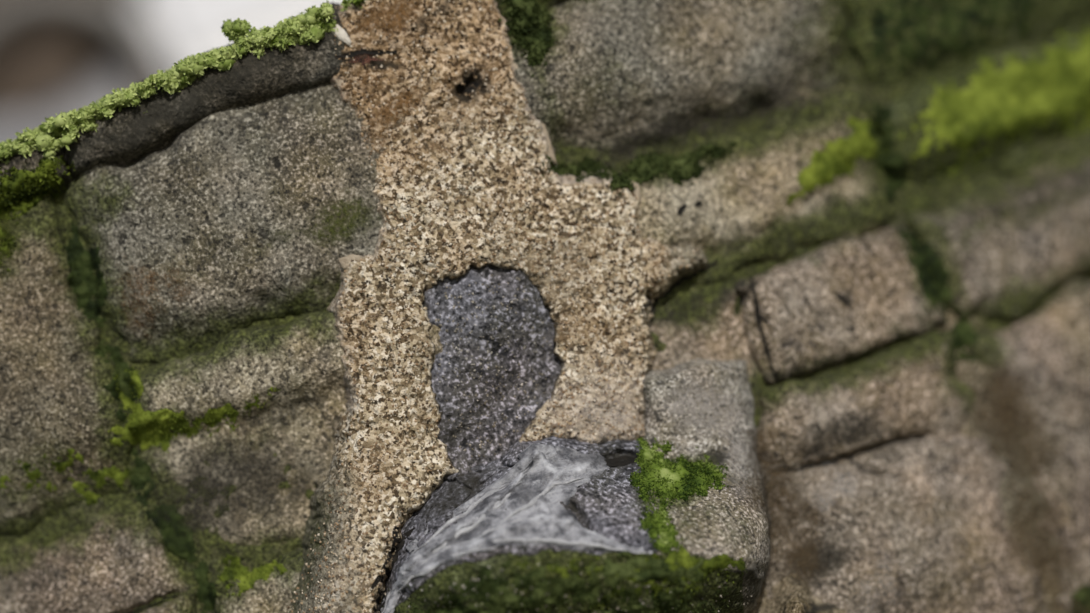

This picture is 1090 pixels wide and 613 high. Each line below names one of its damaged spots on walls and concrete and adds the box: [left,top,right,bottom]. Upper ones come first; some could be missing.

spalling [287,0,708,613]